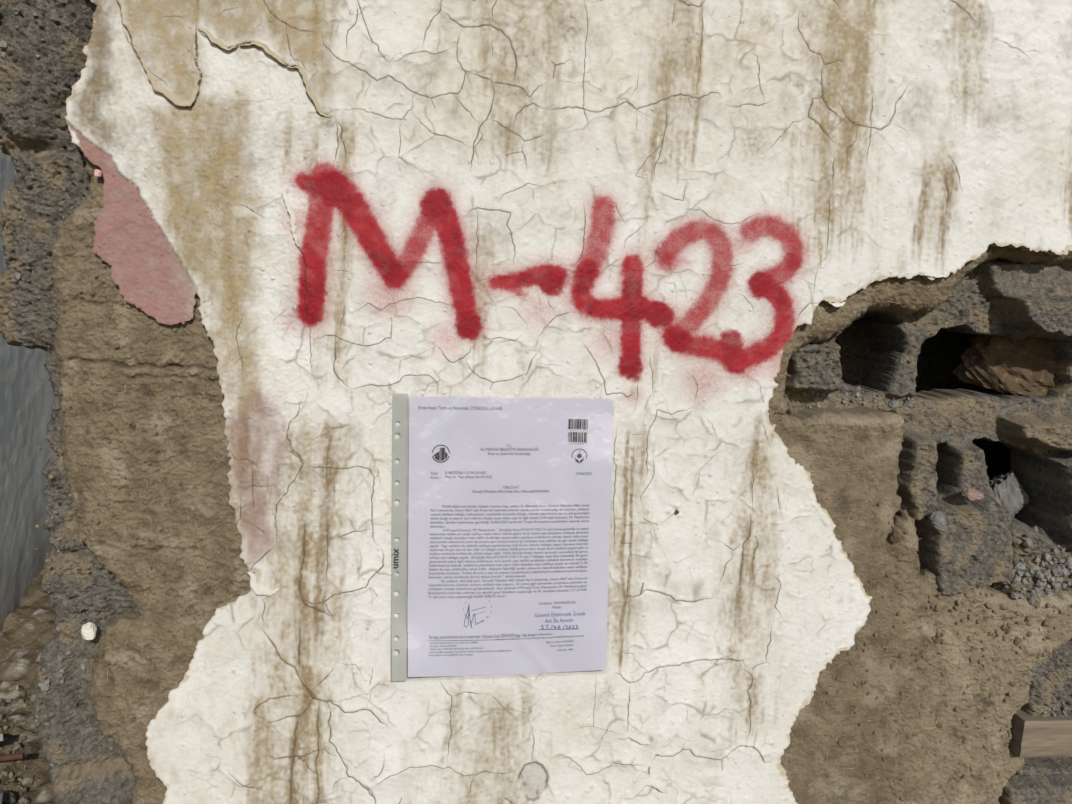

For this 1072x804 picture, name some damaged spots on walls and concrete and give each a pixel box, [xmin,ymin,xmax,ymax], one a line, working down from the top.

spalling [0,0,280,804]
damp [127,0,331,485]
peeling [198,27,332,117]
damp [250,653,322,804]
crack [232,411,384,616]
damp [295,521,342,636]
damp [324,427,346,498]
crack [253,603,512,804]
crack [299,248,567,389]
crack [264,0,769,281]
crack [564,471,781,775]
spalling [768,245,1072,804]